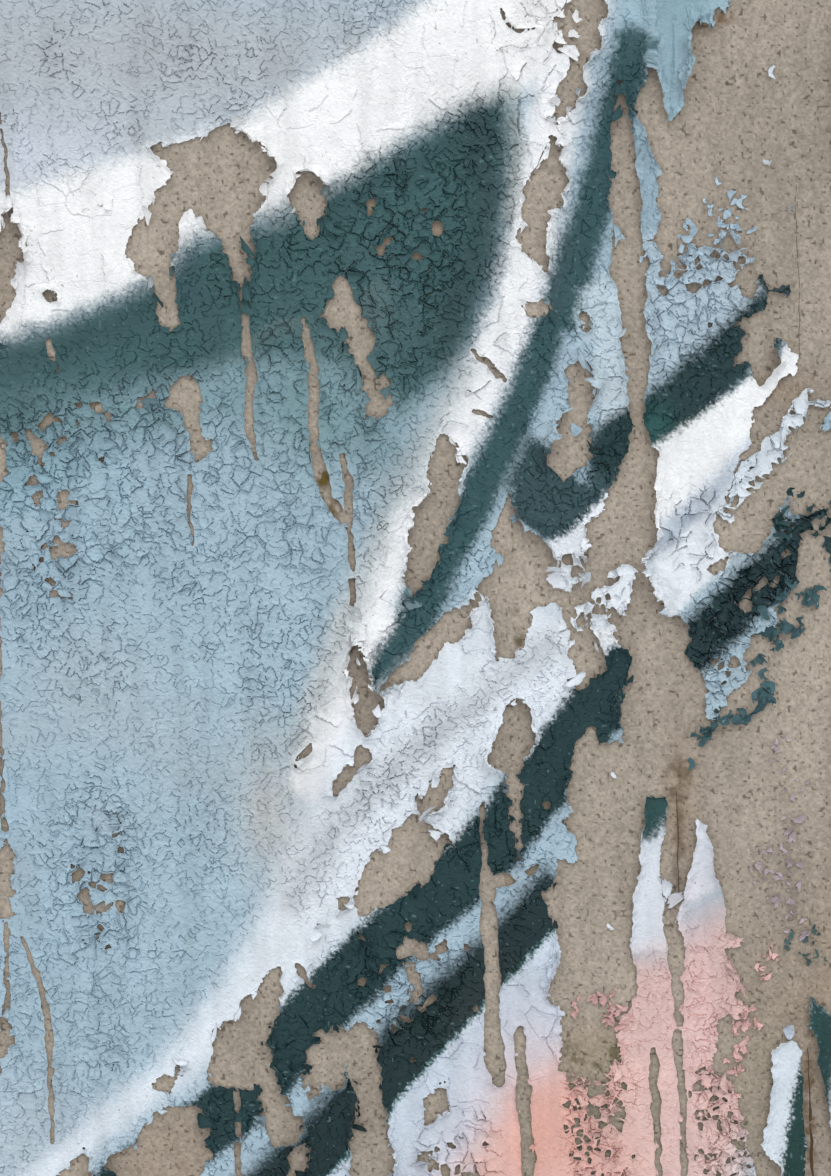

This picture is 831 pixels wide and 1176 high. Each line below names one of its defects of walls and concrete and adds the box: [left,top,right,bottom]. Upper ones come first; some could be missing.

crack [500,8,535,33]
crack [0,112,13,205]
peeling [0,205,27,323]
peeling [125,115,277,332]
crack [301,317,357,612]
crack [470,348,507,383]
peeling [310,0,831,1176]
crack [0,526,55,1144]
peeling [106,1059,213,1176]
peeling [207,966,311,1176]
peeling [292,1018,395,1176]
crack [476,802,537,1176]